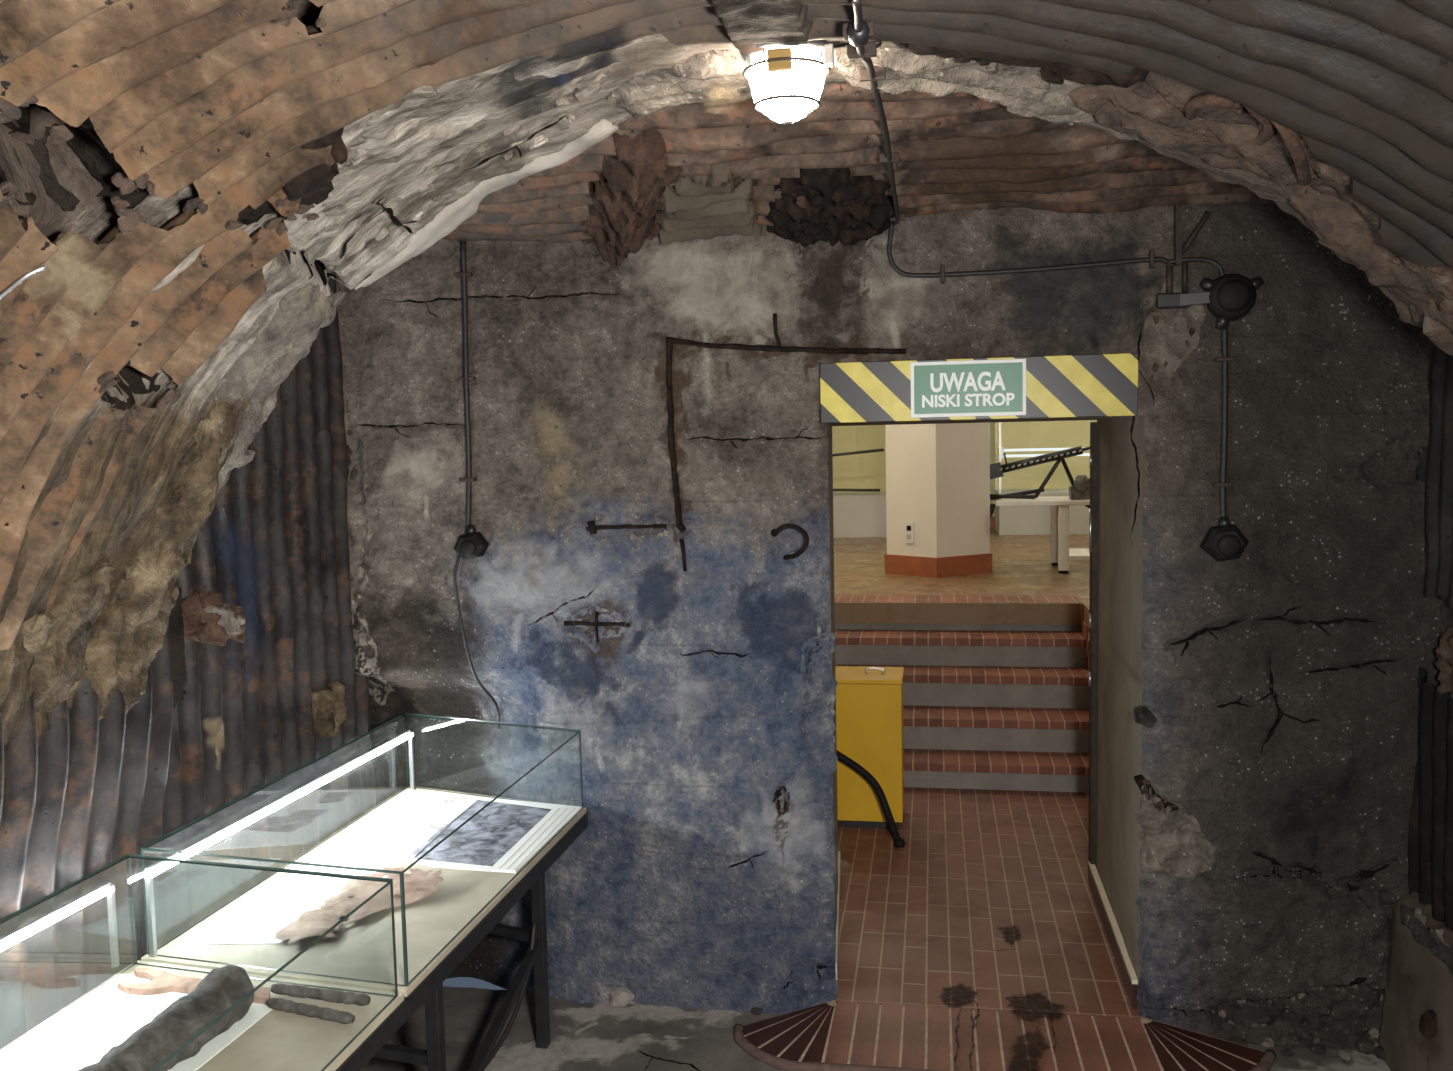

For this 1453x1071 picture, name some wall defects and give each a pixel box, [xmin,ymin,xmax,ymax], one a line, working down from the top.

spalling [834,47,1097,126]
peeling [1142,280,1206,381]
spalling [22,50,763,739]
crack [1169,606,1401,754]
spalling [1435,627,1453,698]
spalling [1137,780,1217,878]
damp [999,925,1021,950]
spalling [1401,902,1453,974]
damp [940,984,980,1070]
damp [1005,993,1064,1071]